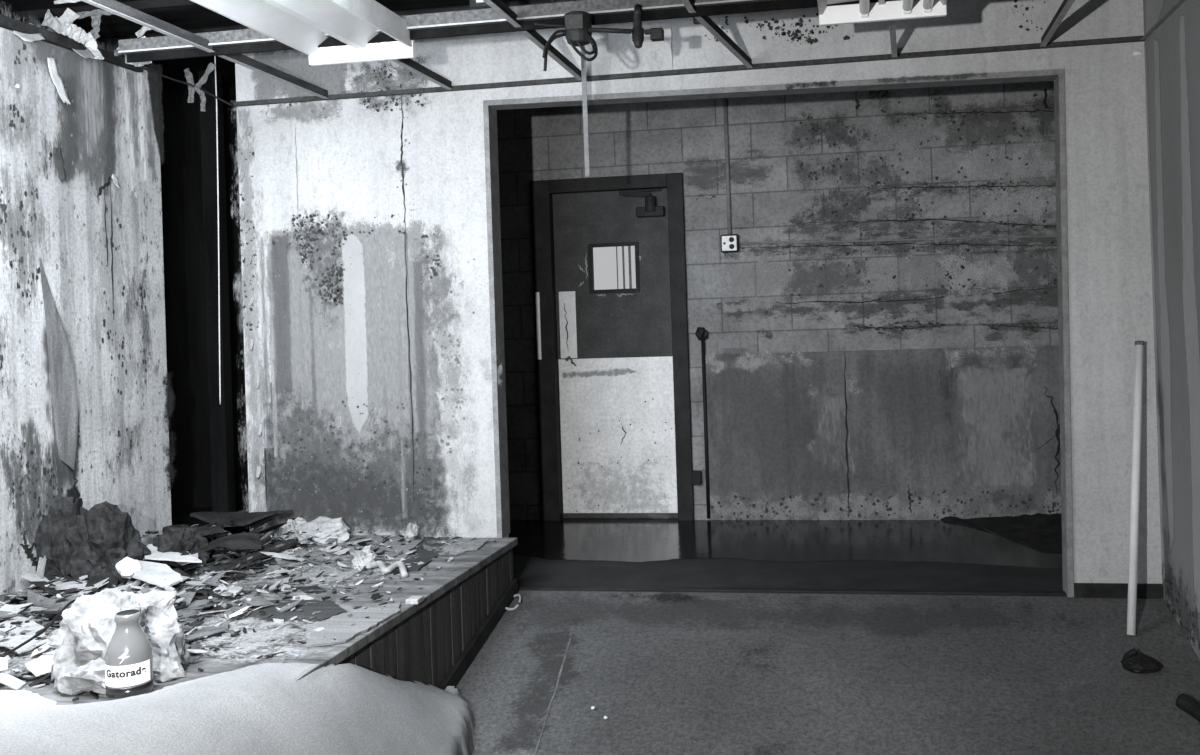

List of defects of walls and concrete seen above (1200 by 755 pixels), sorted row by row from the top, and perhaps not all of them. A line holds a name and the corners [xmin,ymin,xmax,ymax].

damp [0,29,165,565]
damp [255,214,465,537]
crack [396,95,415,497]